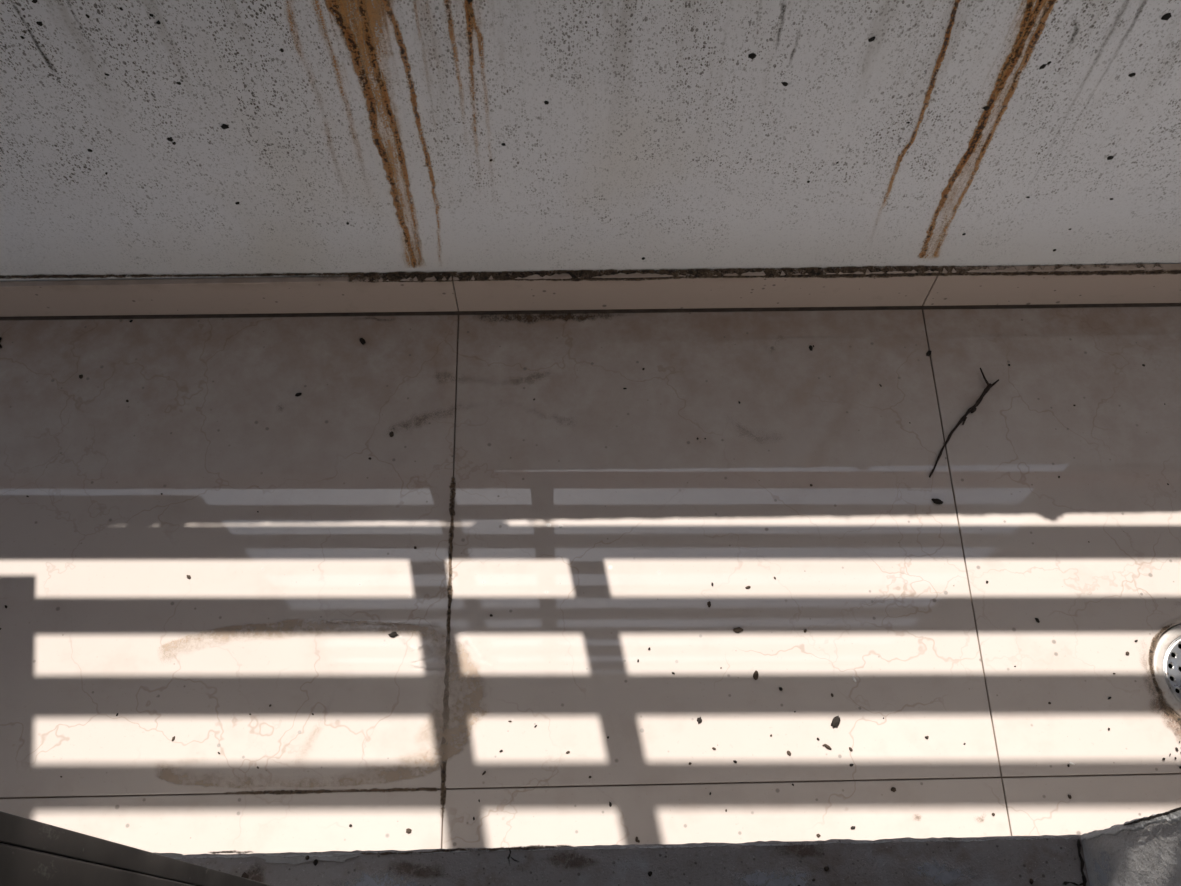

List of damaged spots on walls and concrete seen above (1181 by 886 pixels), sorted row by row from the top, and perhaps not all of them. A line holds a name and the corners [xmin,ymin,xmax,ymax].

rust [313,0,440,267]
rust [444,0,484,100]
rust [883,0,961,205]
rust [919,0,1056,258]
damp [163,620,367,652]
damp [338,625,486,786]